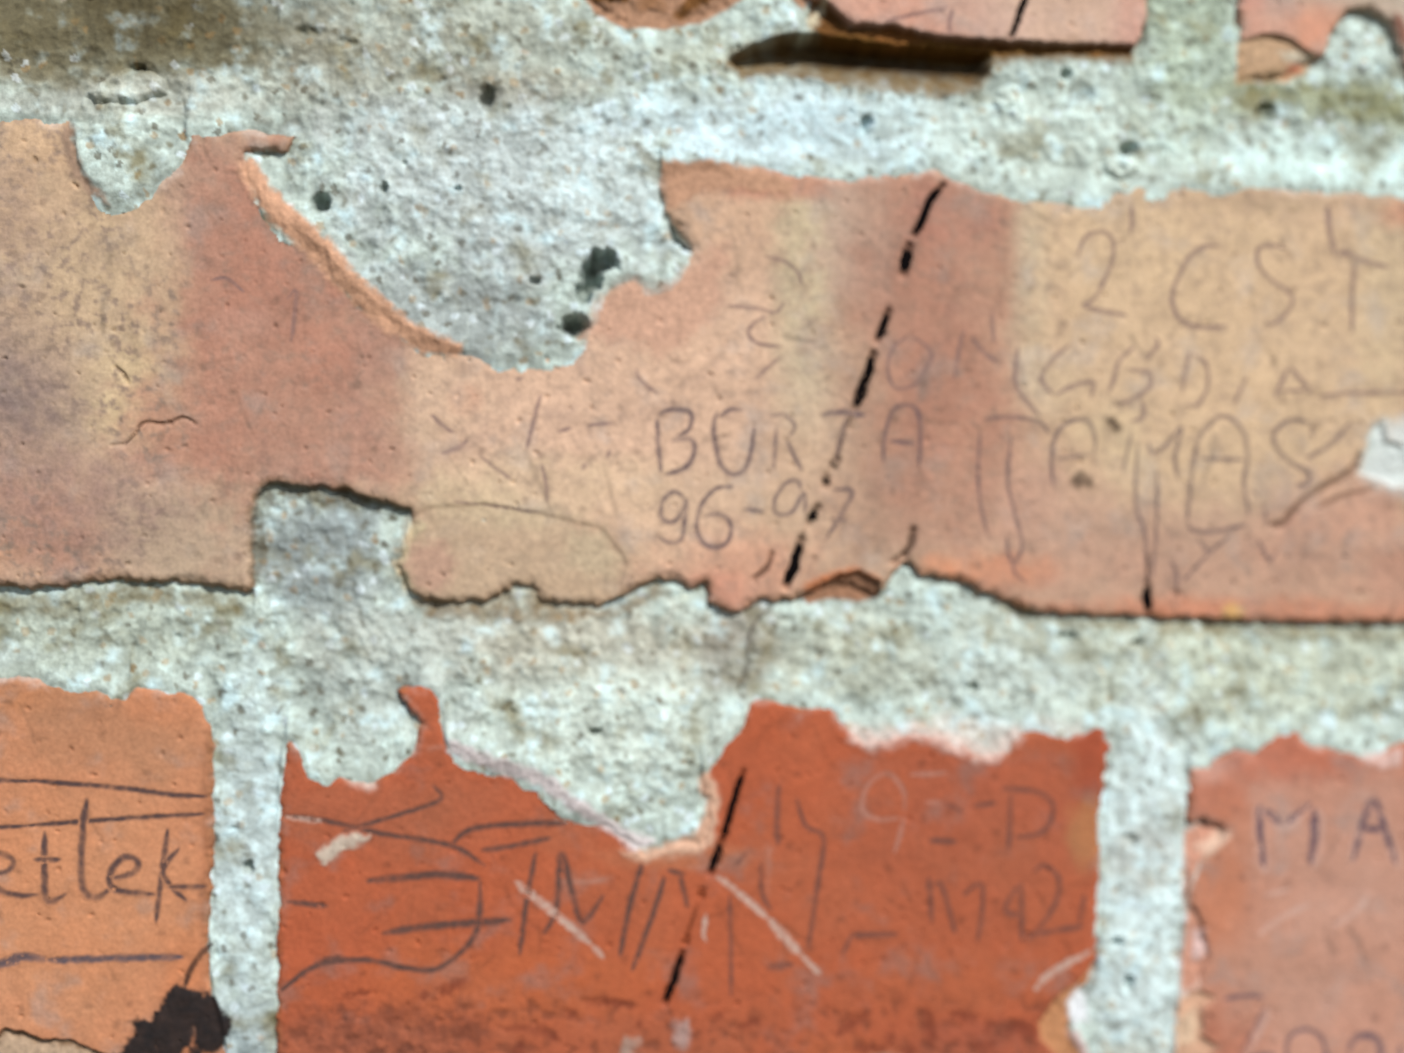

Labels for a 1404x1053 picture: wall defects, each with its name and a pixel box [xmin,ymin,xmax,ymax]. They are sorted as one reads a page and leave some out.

spalling [584,0,743,32]
spalling [792,0,1036,47]
crack [1008,0,1030,39]
spalling [1235,7,1404,78]
spalling [59,110,189,210]
spalling [233,107,800,369]
crack [895,185,945,275]
crack [739,310,892,688]
crack [892,529,917,564]
spalling [444,679,743,865]
crack [662,771,745,1004]
spalling [0,1025,102,1053]